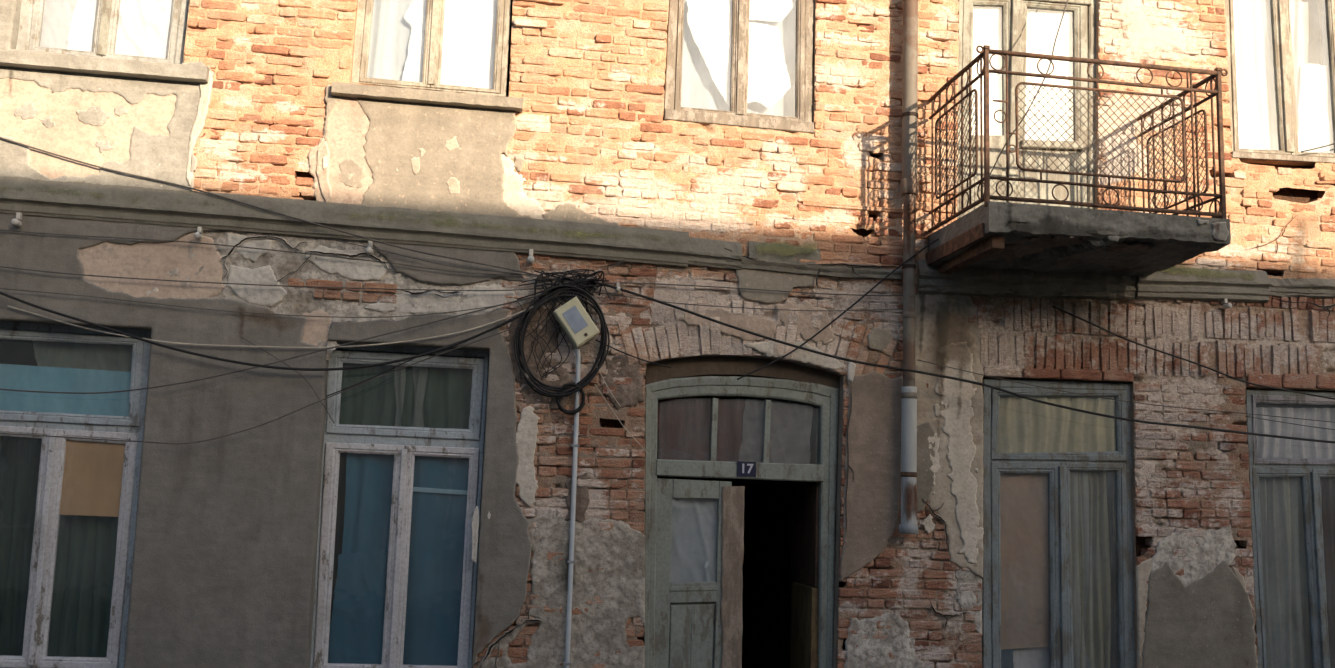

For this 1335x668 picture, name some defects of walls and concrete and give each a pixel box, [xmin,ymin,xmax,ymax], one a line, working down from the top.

peeling [0,78,177,179]
flaking render [1097,0,1335,279]
flaking render [79,0,984,668]
flaking render [968,296,1335,668]